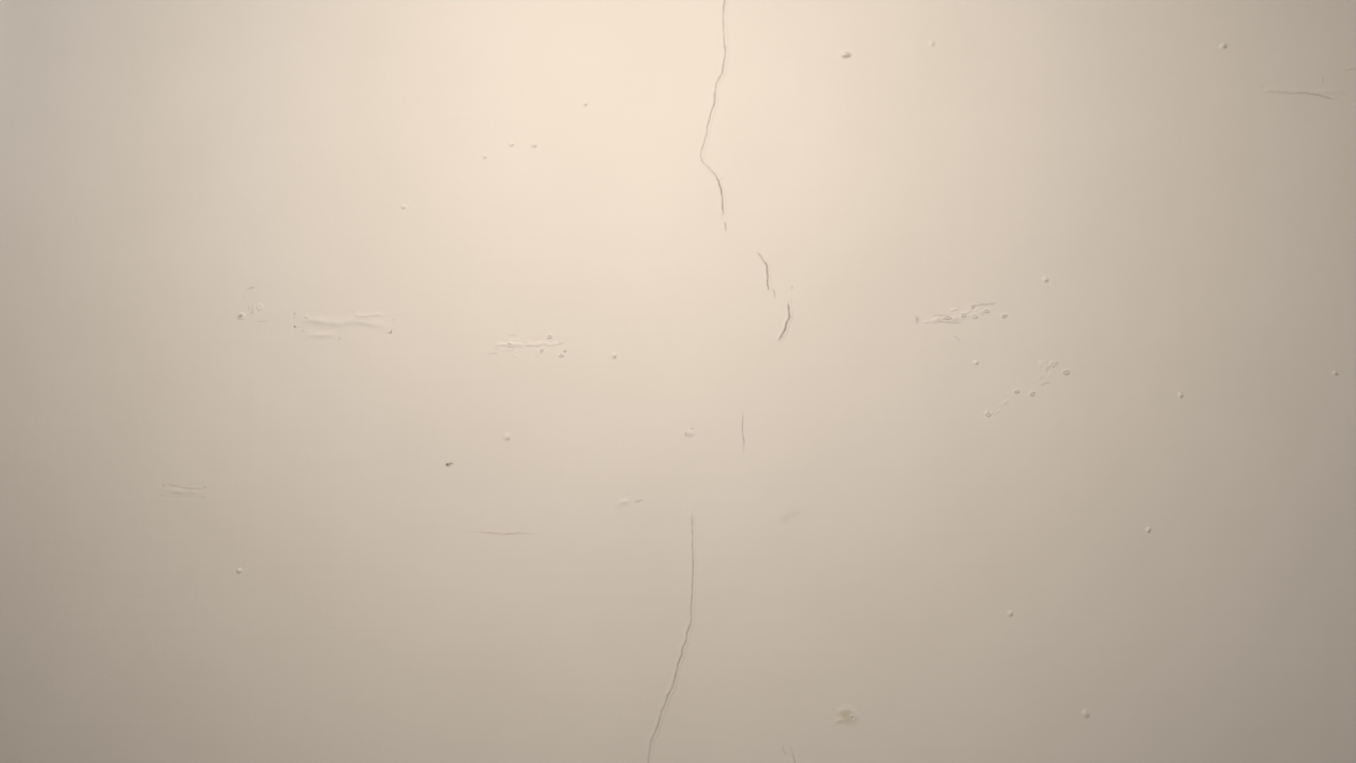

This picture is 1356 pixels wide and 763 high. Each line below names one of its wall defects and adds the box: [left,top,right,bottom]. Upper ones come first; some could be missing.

crack [697,0,730,218]
crack [754,249,793,345]
crack [644,508,697,763]